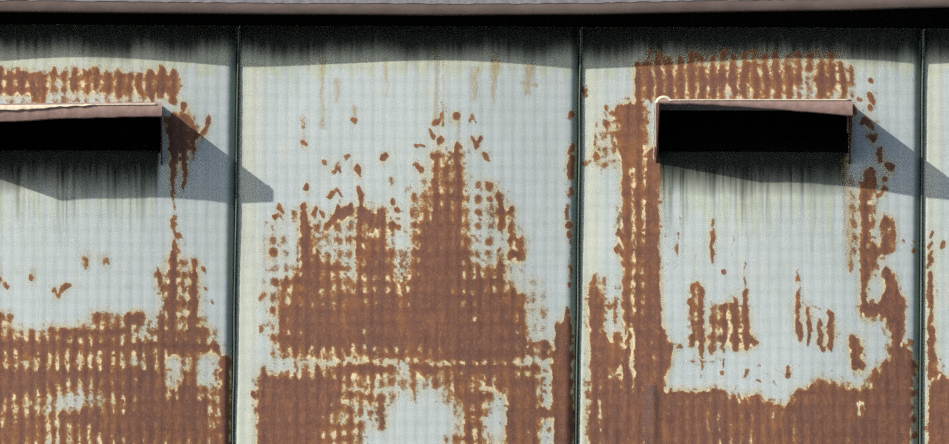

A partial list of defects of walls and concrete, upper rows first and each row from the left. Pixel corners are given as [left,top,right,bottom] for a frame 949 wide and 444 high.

rust [0,64,232,444]
rust [250,48,949,444]